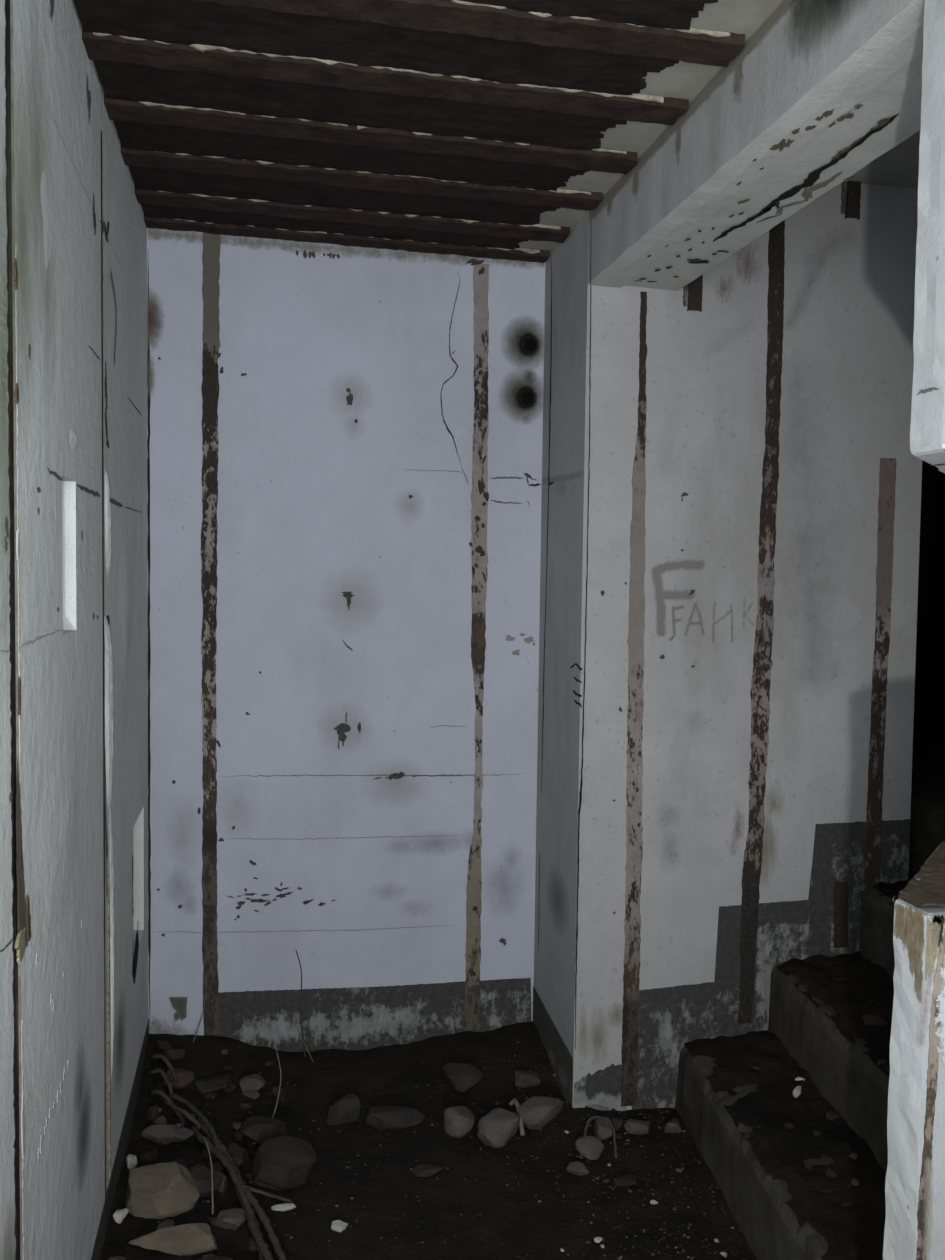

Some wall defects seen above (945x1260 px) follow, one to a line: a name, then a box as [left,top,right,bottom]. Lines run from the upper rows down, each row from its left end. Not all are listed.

peeling [770,105,863,151]
crack [688,114,899,264]
spalling [777,171,843,214]
peeling [638,227,728,282]
rust [474,480,489,528]
rust [469,542,486,593]
crack [223,258,591,1050]